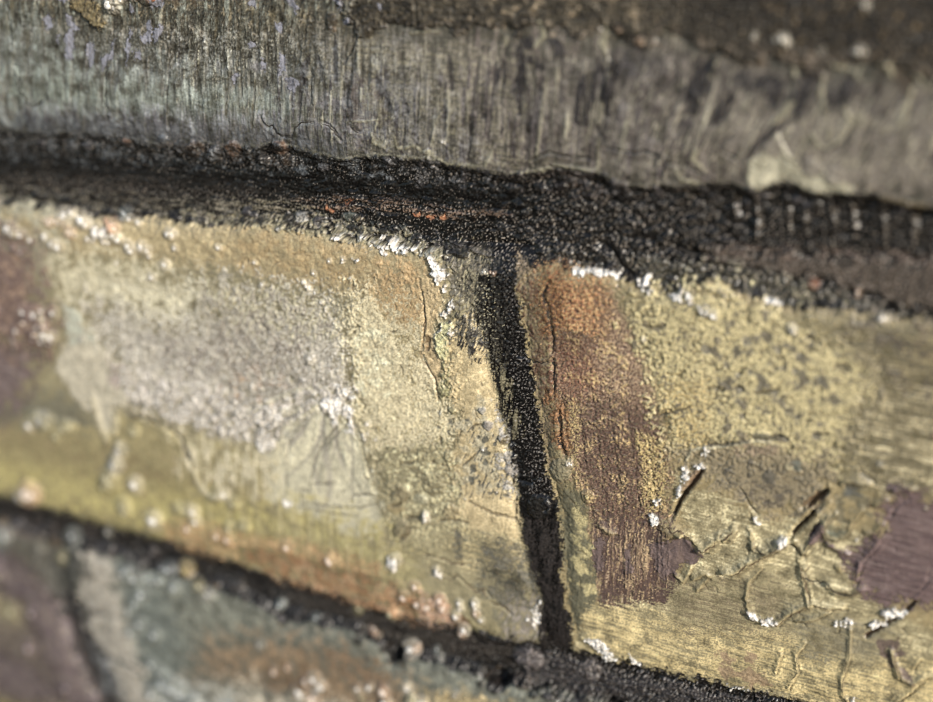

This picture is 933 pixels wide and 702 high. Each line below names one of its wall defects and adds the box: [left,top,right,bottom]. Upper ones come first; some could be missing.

corrosion [530,259,611,454]
damp [120,367,282,453]
damp [316,384,358,437]
peeling [647,538,703,581]
crack [660,470,733,553]
crack [726,488,884,627]
peeling [808,481,933,611]